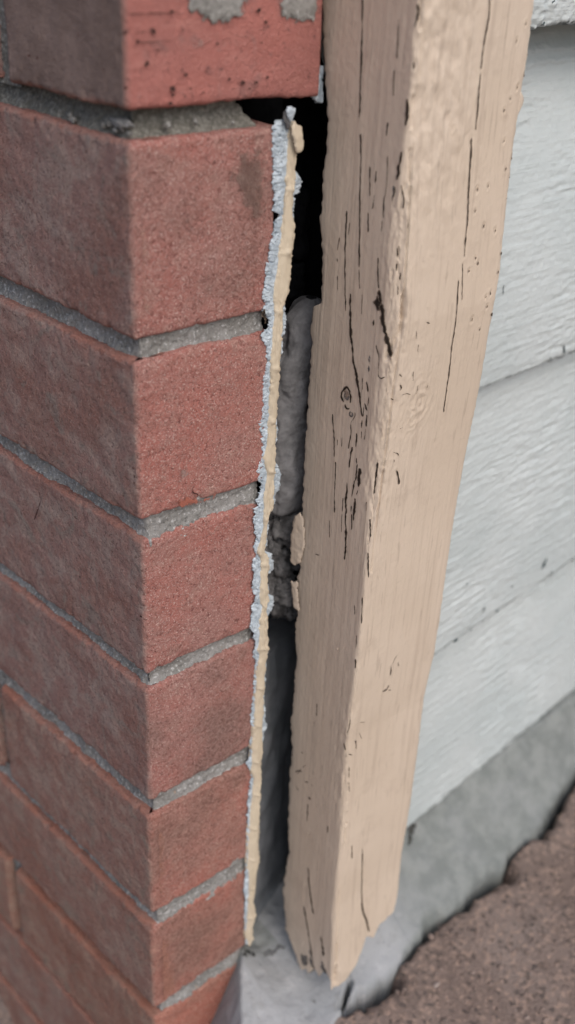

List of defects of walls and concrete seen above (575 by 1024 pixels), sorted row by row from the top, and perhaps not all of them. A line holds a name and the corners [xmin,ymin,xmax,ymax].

peeling [292,171,302,218]
crack [329,0,490,560]
peeling [273,463,281,504]
peeling [290,513,306,565]
peeling [265,521,274,616]
peeling [291,581,300,611]
crack [303,868,314,955]